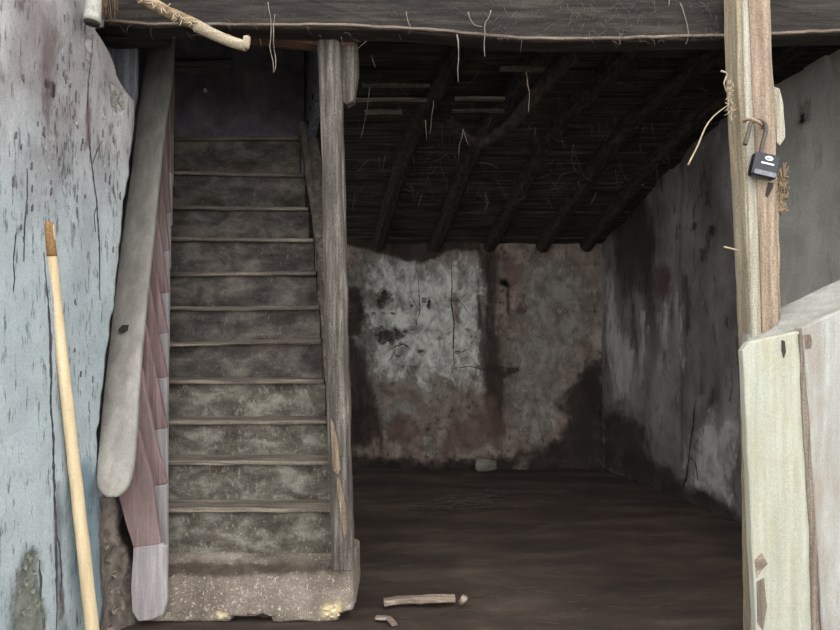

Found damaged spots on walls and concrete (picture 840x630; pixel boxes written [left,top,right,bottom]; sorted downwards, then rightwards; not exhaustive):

crack [87,34,103,296]
crack [388,276,420,359]
damp [349,339,476,470]
damp [347,242,519,433]
crack [451,266,514,399]
damp [494,197,739,520]
crack [681,401,698,499]